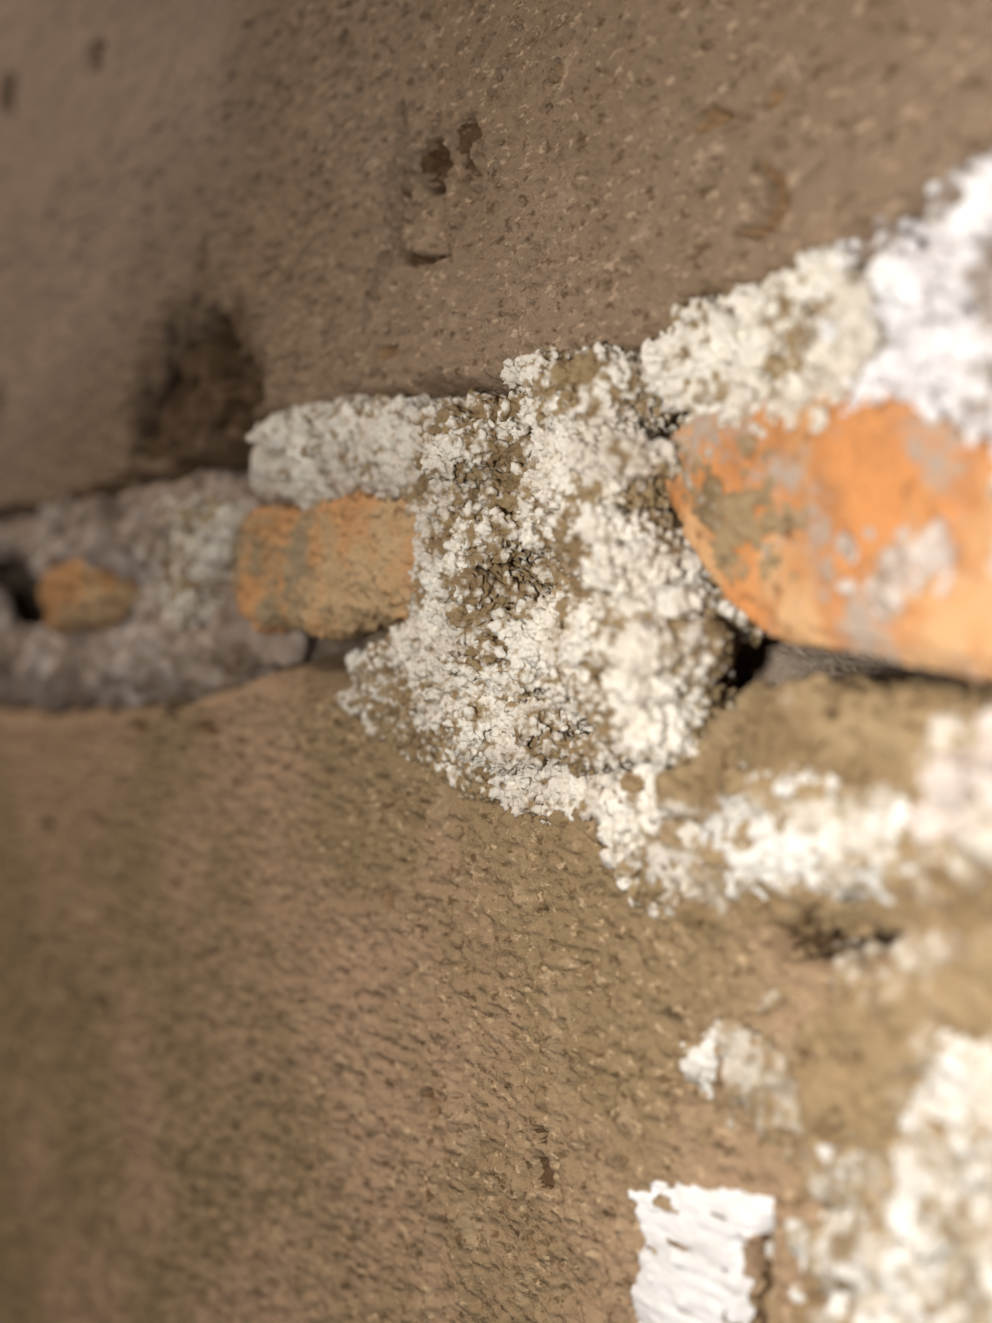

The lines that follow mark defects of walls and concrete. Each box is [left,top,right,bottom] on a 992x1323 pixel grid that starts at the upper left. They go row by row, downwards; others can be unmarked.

crack [400,122,483,199]
spalling [742,158,791,240]
crack [403,252,452,266]
spalling [0,468,310,732]
spalling [785,929,899,960]
peeling [628,1180,775,1323]